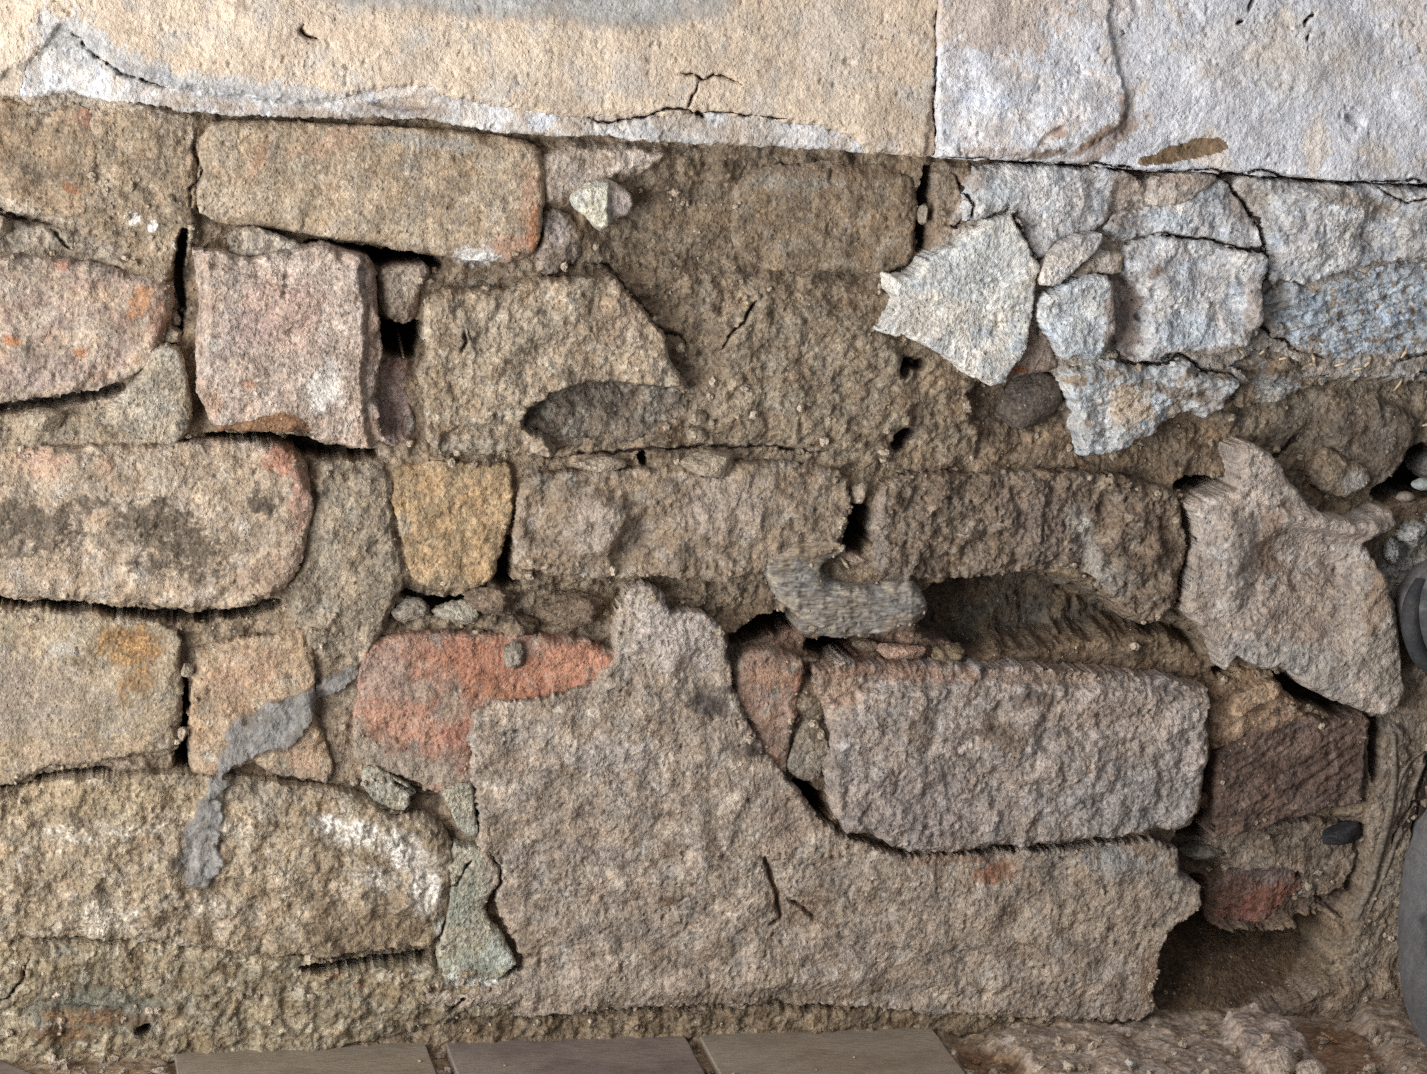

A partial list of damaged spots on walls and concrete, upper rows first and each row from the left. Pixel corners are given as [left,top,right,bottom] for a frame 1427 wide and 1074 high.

crack [588,73,789,124]
crack [943,156,1427,359]
spalling [900,357,924,377]
crack [1117,352,1238,380]
spalling [890,428,915,450]
crack [1273,435,1301,458]
spalling [1152,908,1327,1012]